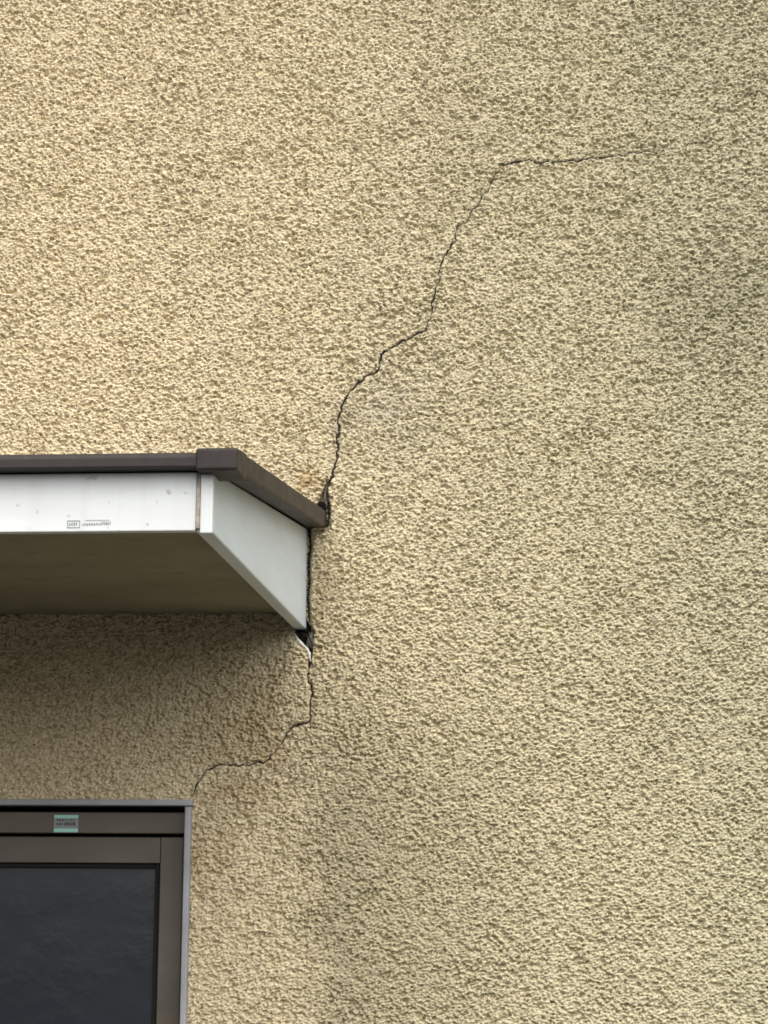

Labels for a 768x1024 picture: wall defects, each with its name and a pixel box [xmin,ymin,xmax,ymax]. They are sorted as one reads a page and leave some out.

crack [327,151,661,487]
crack [193,660,314,795]